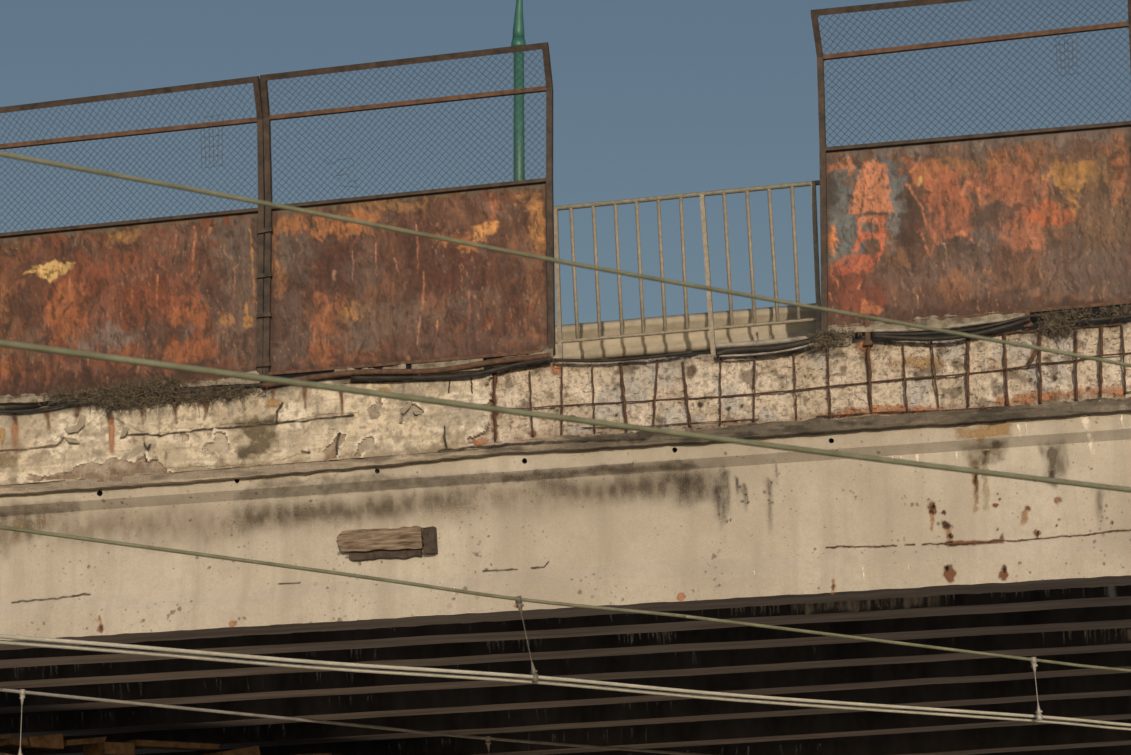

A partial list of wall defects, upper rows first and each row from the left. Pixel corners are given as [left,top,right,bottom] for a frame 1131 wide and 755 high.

spalling [368,397,383,420]
spalling [469,319,1131,446]
rust [996,376,1125,404]
spalling [28,454,173,484]
spalling [323,433,346,463]
damp [503,463,702,501]
rust [958,422,1010,510]
damp [1047,447,1062,485]
damp [1080,415,1093,454]
damp [223,480,466,527]
rust [928,502,1004,546]
rust [944,565,956,582]